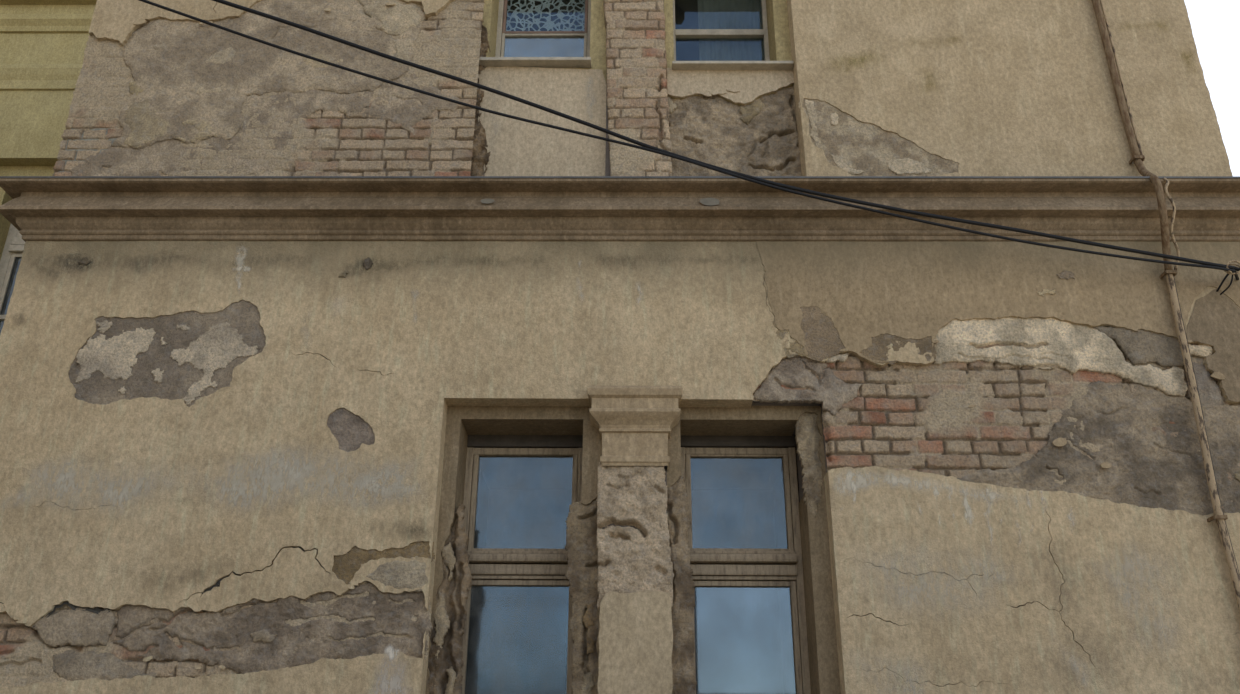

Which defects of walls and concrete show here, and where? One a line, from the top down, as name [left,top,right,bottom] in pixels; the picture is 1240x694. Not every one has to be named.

spalling [52,0,490,176]
spalling [603,0,959,176]
peeling [68,300,266,407]
peeling [327,408,375,452]
spalling [753,306,1240,516]
crack [202,572,250,594]
spalling [0,504,472,694]
spalling [565,462,697,694]